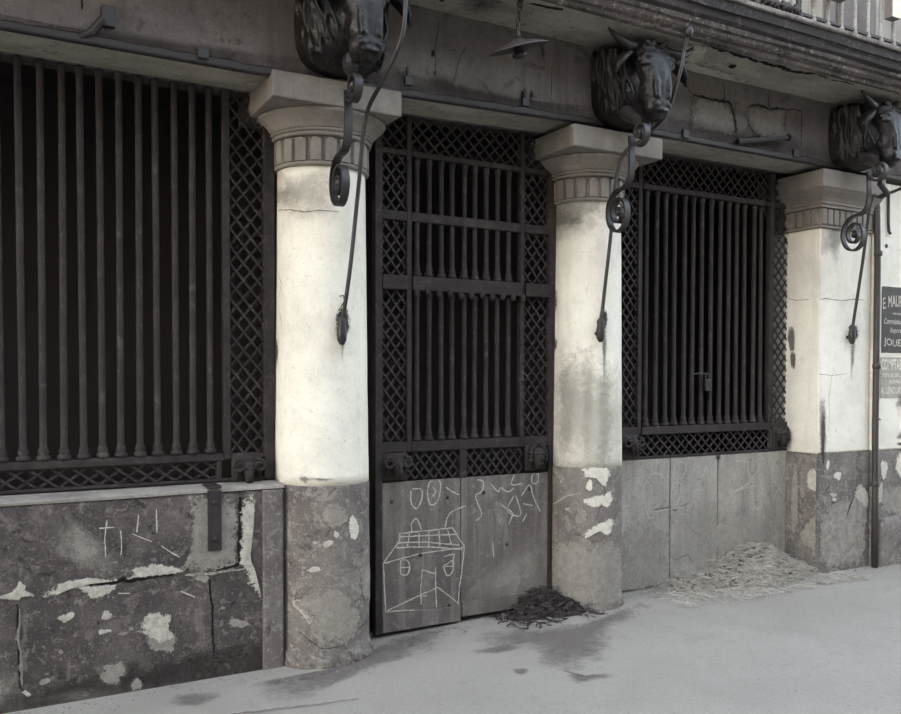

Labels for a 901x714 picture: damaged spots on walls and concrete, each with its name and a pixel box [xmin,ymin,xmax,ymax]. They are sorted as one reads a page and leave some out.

peeling [180,491,261,597]
spalling [312,502,359,548]
spalling [552,465,622,606]
spalling [790,435,901,572]
spalling [0,581,34,600]
crack [15,604,31,697]
spalling [58,612,75,623]
spalling [98,610,177,653]
crack [43,563,245,653]
spalling [228,617,251,628]